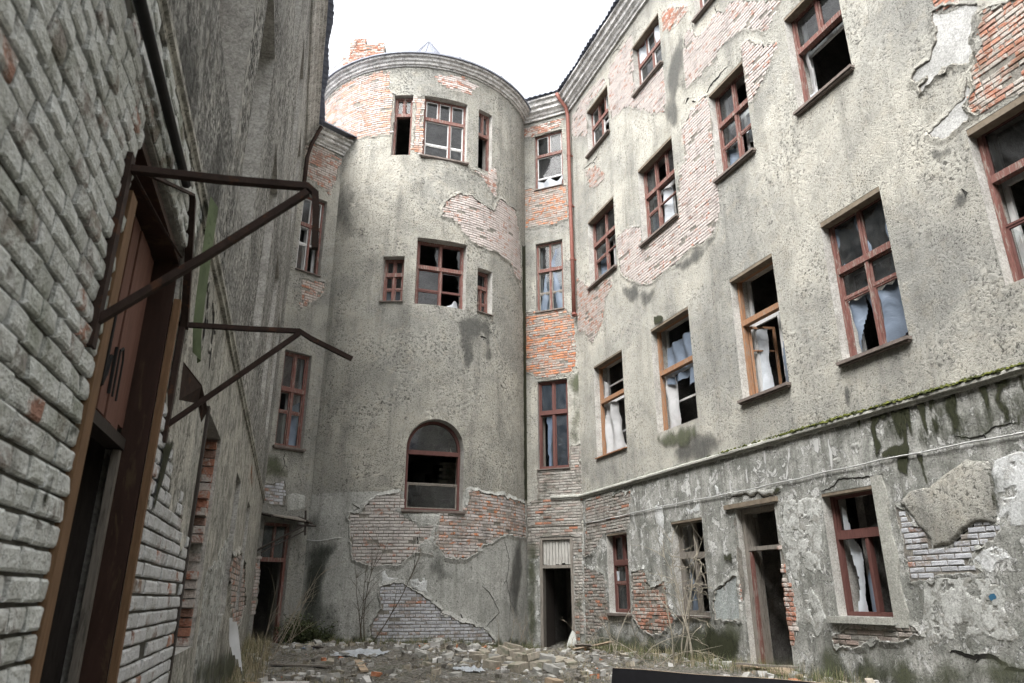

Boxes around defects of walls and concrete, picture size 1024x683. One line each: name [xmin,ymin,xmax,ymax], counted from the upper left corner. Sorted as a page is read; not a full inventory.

flaking render [325,70,397,141]
flaking render [410,94,425,158]
flaking render [906,0,1024,146]
flaking render [524,0,785,380]
flaking render [439,164,569,293]
water stain [460,319,491,364]
water stain [676,436,716,459]
crack [955,418,1017,441]
flaking render [345,441,633,645]
flaking render [777,451,1024,655]
flaking render [630,564,678,640]
crack [947,645,1024,672]